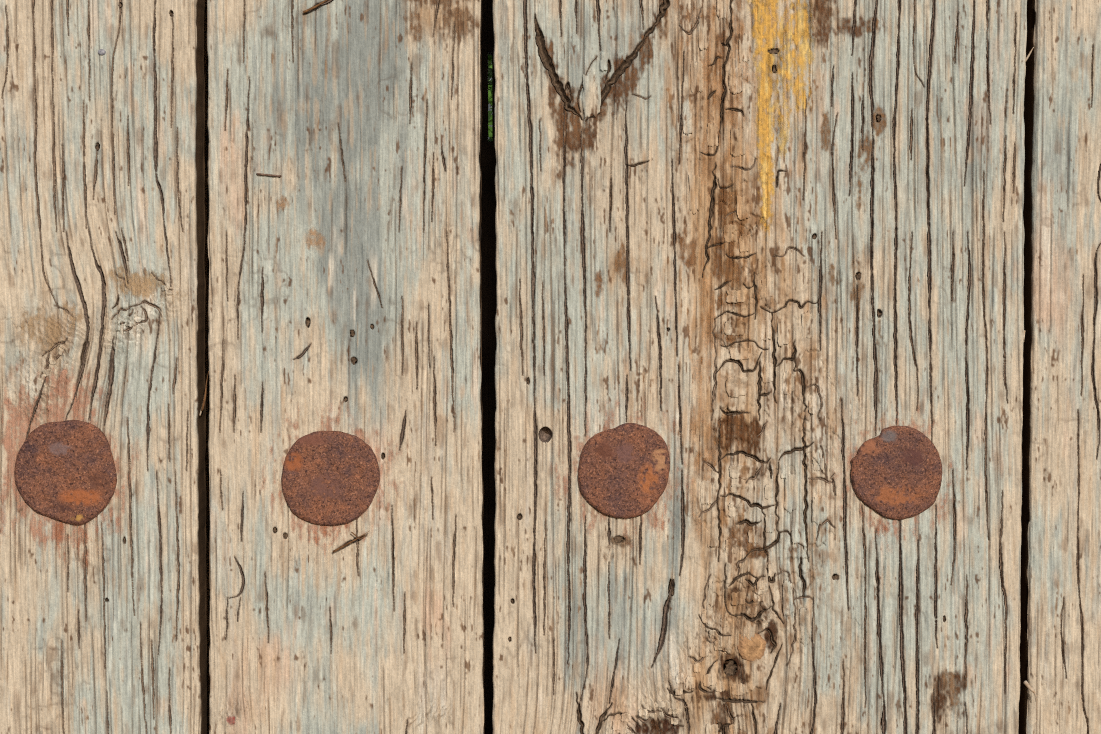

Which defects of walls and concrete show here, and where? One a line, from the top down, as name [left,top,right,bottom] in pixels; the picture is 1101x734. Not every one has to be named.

corrosion [1,370,101,564]
crack [1,0,188,734]
crack [219,0,263,432]
crack [220,471,269,643]
crack [519,0,1016,734]